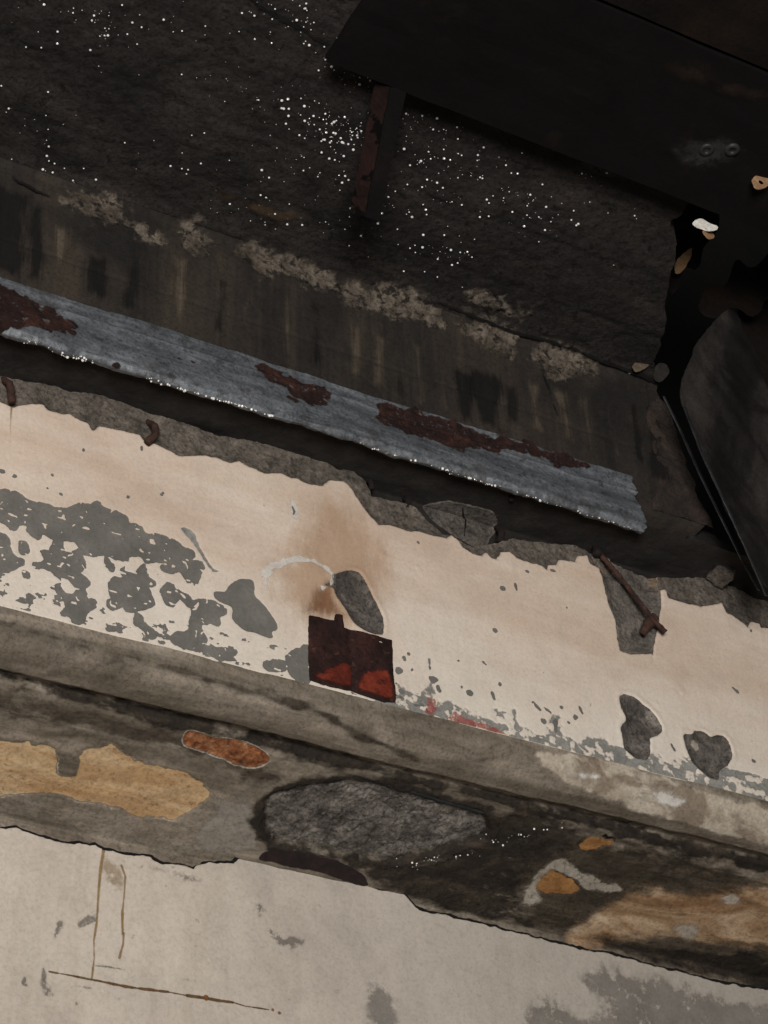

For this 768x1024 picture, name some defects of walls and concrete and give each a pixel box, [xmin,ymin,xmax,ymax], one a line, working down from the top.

leakage [57,190,167,245]
rust [0,284,78,335]
rust [255,363,331,406]
rust [375,402,590,468]
spalling [0,376,768,655]
peeling [0,488,325,686]
peeling [375,652,768,801]
peeling [0,741,212,821]
leakage [0,670,768,934]
crack [0,825,768,990]
crack [48,971,281,1014]
leakage [592,931,768,988]